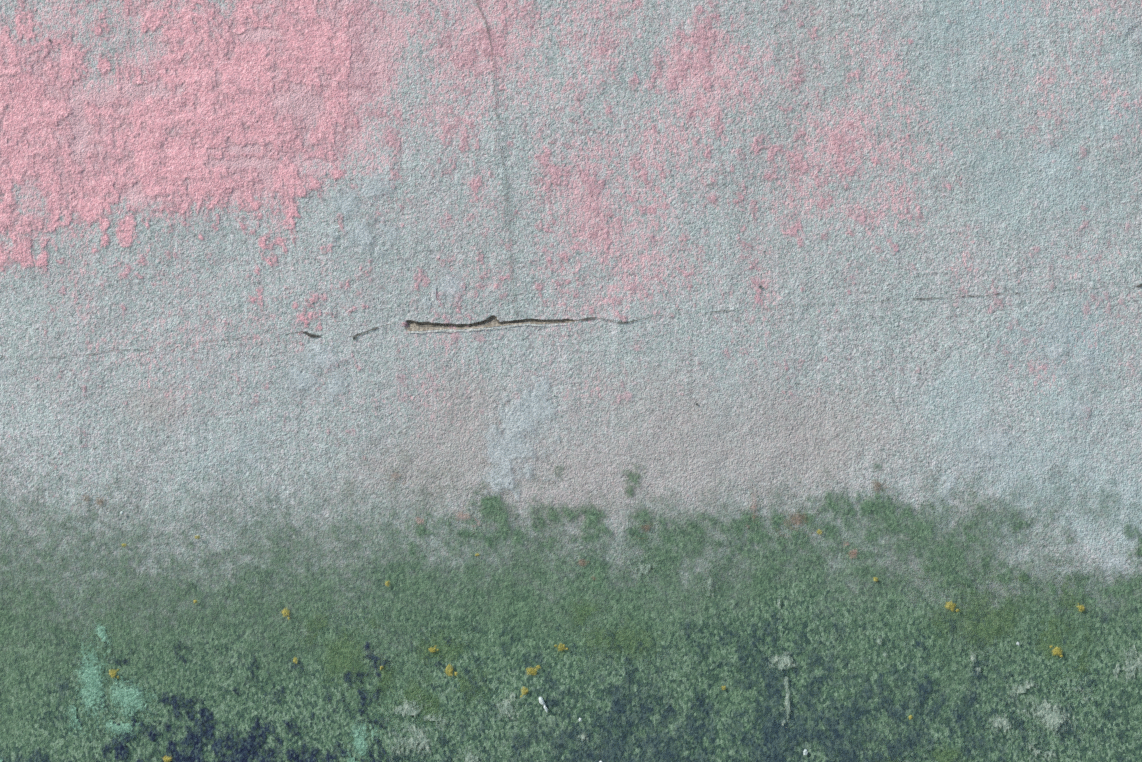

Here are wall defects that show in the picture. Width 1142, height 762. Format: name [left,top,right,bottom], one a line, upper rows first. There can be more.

peeling [0,0,389,306]
crack [351,315,662,338]
water stain [60,625,445,762]
water stain [493,693,521,720]
water stain [560,673,719,762]
water stain [738,626,943,762]
water stain [966,680,1075,762]
water stain [1111,642,1142,683]